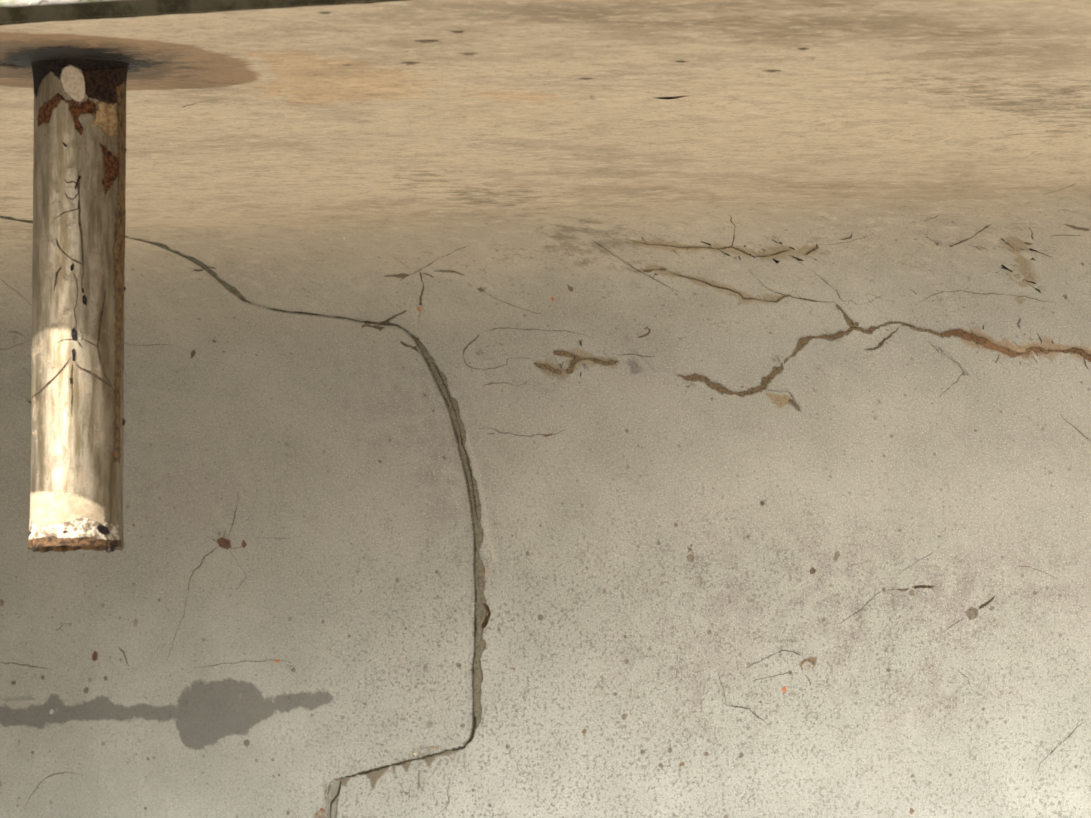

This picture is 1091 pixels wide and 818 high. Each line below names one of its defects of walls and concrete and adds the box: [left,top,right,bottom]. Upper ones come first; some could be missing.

water stain [0,30,281,98]
rust [37,66,129,462]
crack [624,213,1091,412]
water stain [0,672,338,757]